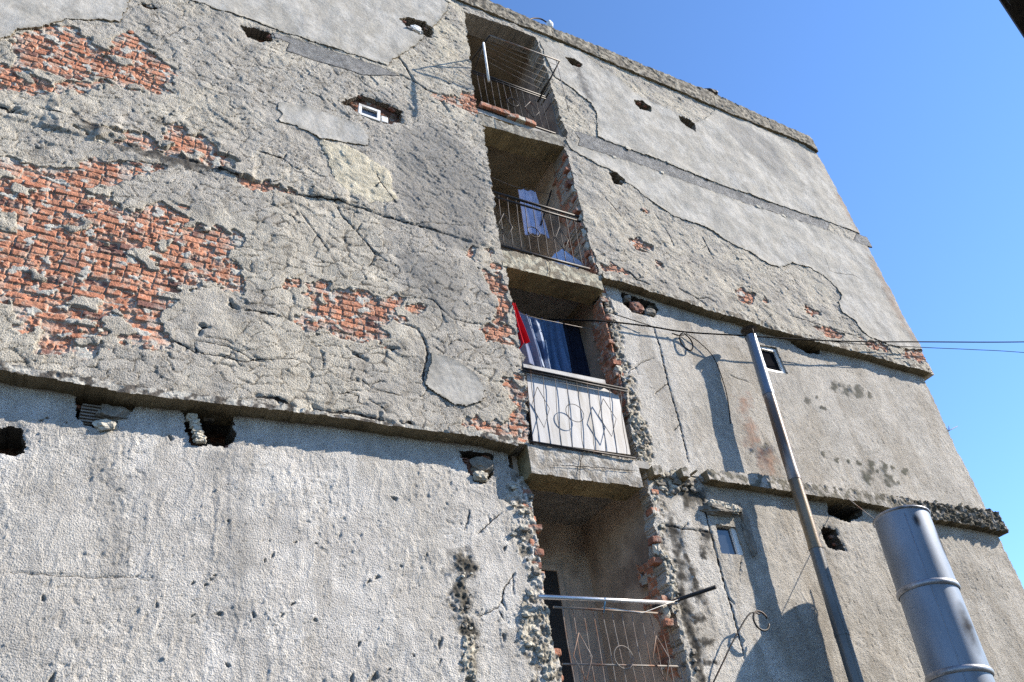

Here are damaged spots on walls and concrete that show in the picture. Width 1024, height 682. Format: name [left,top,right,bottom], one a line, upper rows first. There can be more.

flaking render [0,0,182,96]
flaking render [0,123,296,362]
crack [260,151,467,267]
flaking render [539,41,928,364]
spalling [185,413,228,448]
crack [174,326,324,367]
crack [230,303,276,315]
crack [255,354,413,425]
flaking render [282,272,427,349]
crack [404,324,429,383]
flaking render [425,352,530,442]
crack [629,335,688,458]